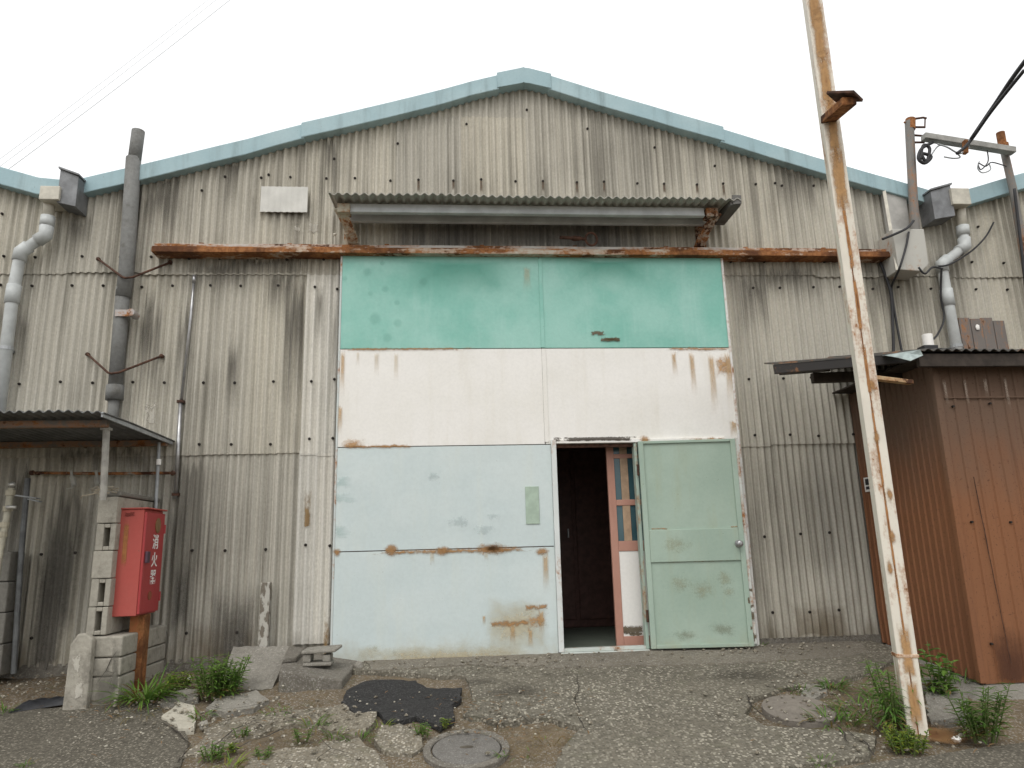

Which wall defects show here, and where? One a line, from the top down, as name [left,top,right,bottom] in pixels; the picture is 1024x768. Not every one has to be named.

rust [809,0,854,268]
rust [853,280,870,329]
damp [228,358,236,381]
rust [672,347,731,374]
rust [863,347,875,392]
rust [385,544,518,555]
rust [872,410,966,743]
damp [224,612,248,657]
rust [483,605,546,638]